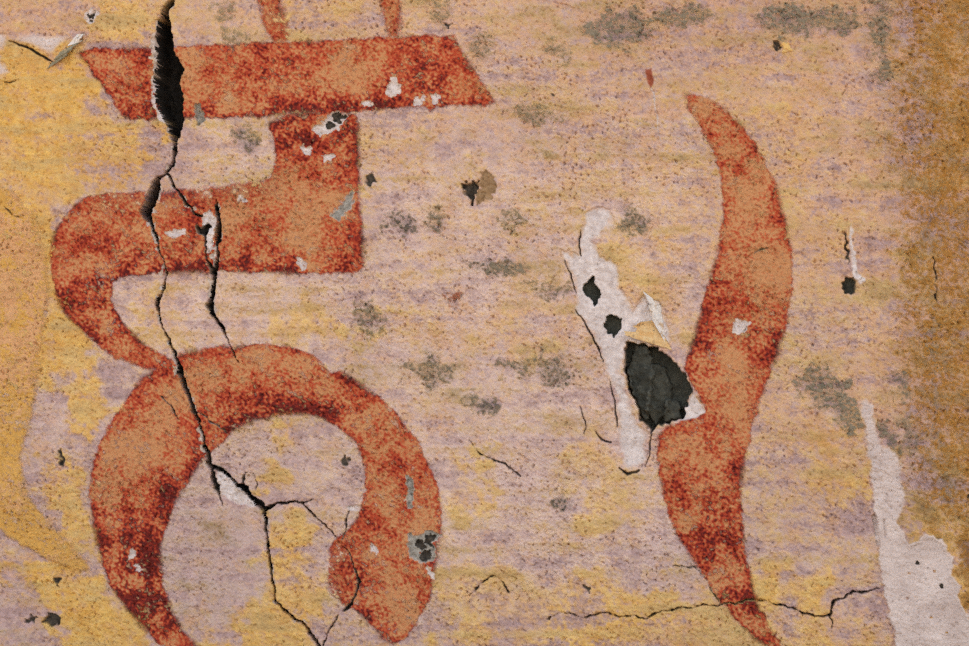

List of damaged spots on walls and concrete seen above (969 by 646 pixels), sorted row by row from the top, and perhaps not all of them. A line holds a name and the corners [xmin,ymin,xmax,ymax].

peeling [0,6,100,83]
crack [140,0,362,646]
peeling [560,206,706,476]
spalling [406,530,442,580]
crack [547,565,879,633]